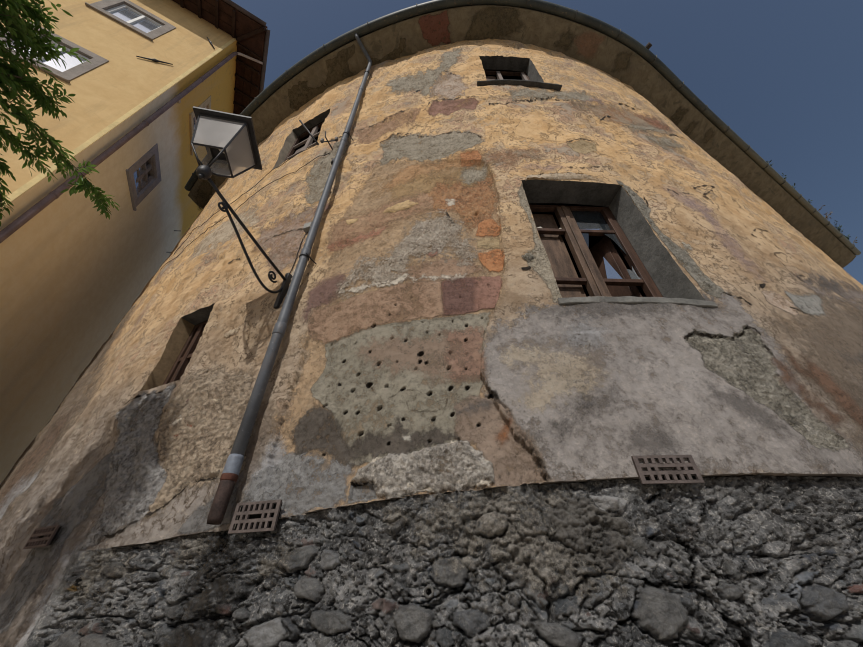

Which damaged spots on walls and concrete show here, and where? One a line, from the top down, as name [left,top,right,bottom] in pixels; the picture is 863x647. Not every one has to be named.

spalling [288,35,407,110]
flaking render [190,207,315,279]
spalling [308,10,548,504]
spalling [518,172,592,302]
flaking render [74,366,253,552]
crack [483,372,551,482]
spalling [684,325,850,451]